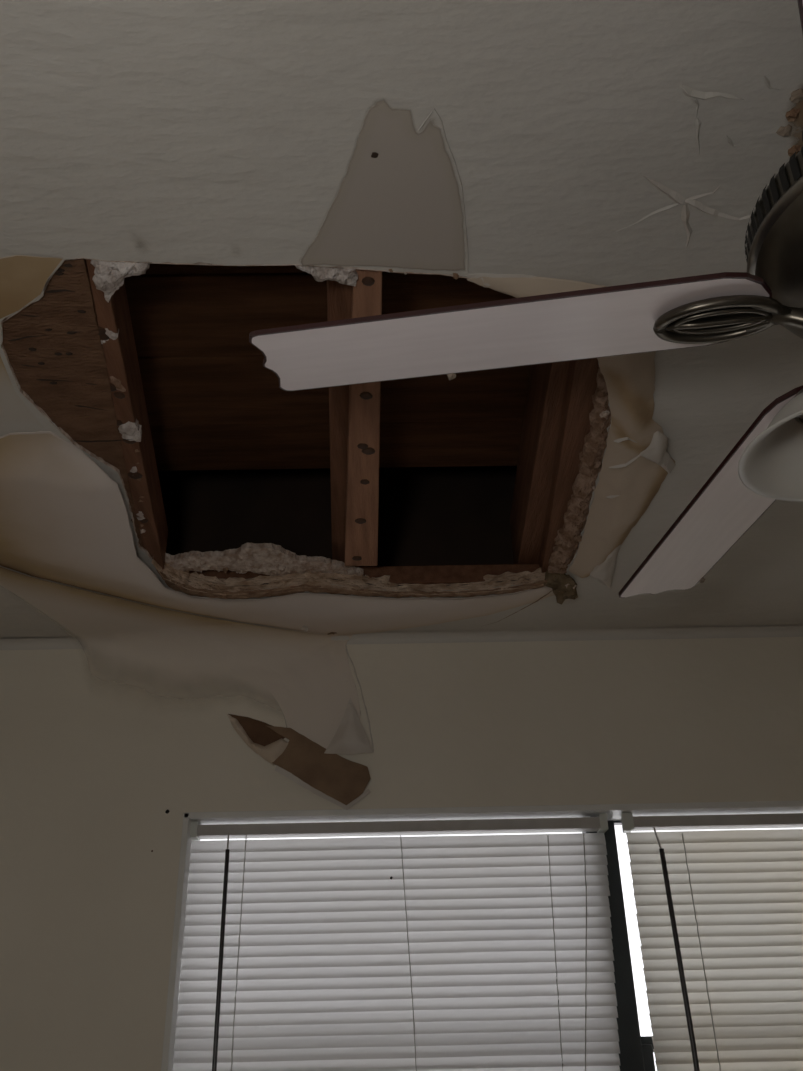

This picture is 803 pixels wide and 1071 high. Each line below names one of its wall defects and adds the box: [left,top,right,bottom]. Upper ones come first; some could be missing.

leakage [0,255,62,319]
spalling [1,258,143,548]
peeling [465,273,608,298]
peeling [548,352,675,589]